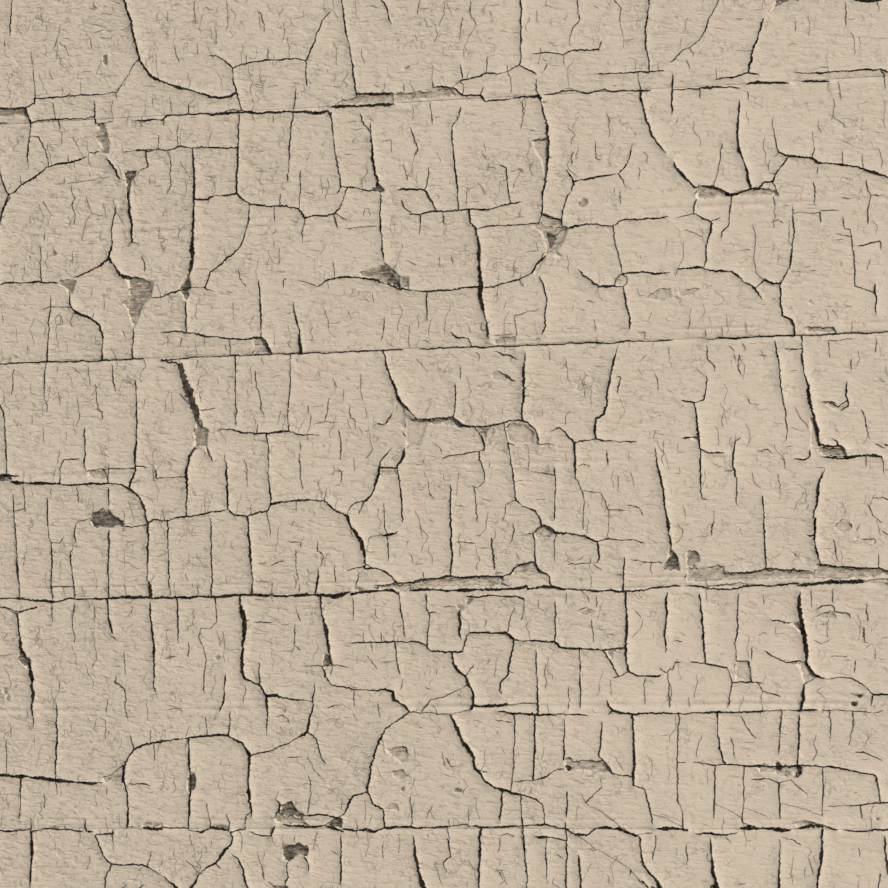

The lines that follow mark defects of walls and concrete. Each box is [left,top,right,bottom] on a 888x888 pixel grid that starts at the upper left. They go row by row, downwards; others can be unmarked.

crack [0,0,405,298]
peeling [358,262,409,288]
crack [299,0,888,505]
peeling [121,276,152,323]
crack [0,247,144,420]
peeling [89,508,123,528]
crack [0,281,888,888]
peeling [274,801,308,826]
peeling [282,843,309,861]